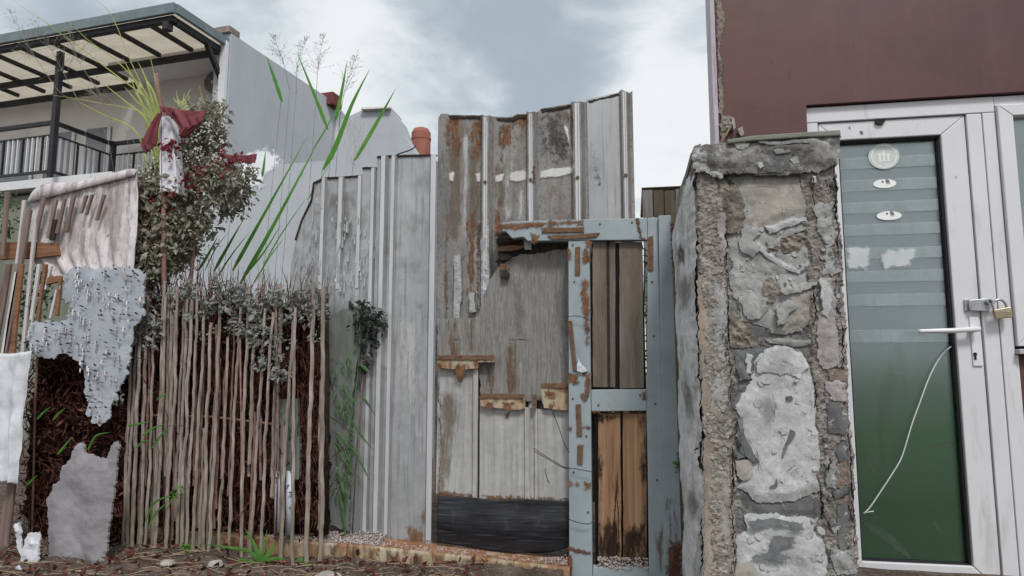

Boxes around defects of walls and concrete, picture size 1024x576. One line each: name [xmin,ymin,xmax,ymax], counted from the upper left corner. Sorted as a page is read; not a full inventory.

rust [445,118,482,298]
rust [435,267,591,500]
rust [494,112,584,243]
rust [561,547,591,576]
crack [694,437,704,474]
crack [697,514,705,574]
crack [696,226,732,407]
peeling [691,0,857,576]